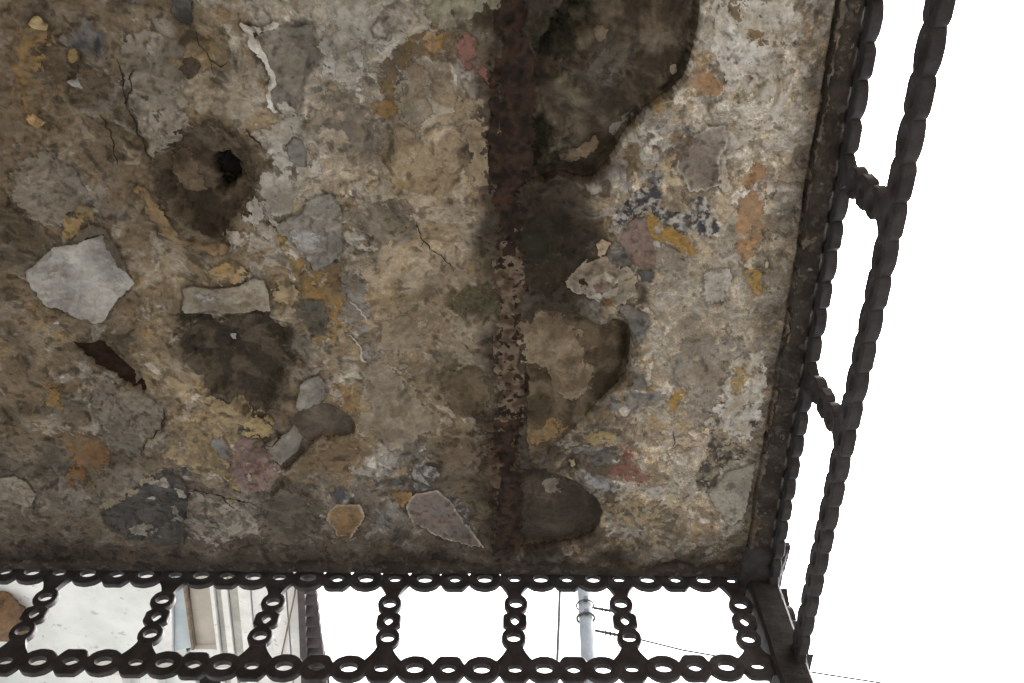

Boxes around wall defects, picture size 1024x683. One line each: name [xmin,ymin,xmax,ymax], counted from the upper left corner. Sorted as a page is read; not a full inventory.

crack [100,61,158,164]
peeling [62,205,94,246]
crack [416,222,454,271]
water stain [638,269,655,283]
hole [75,340,147,390]
spalling [98,185,385,553]
corrosion [466,411,524,536]